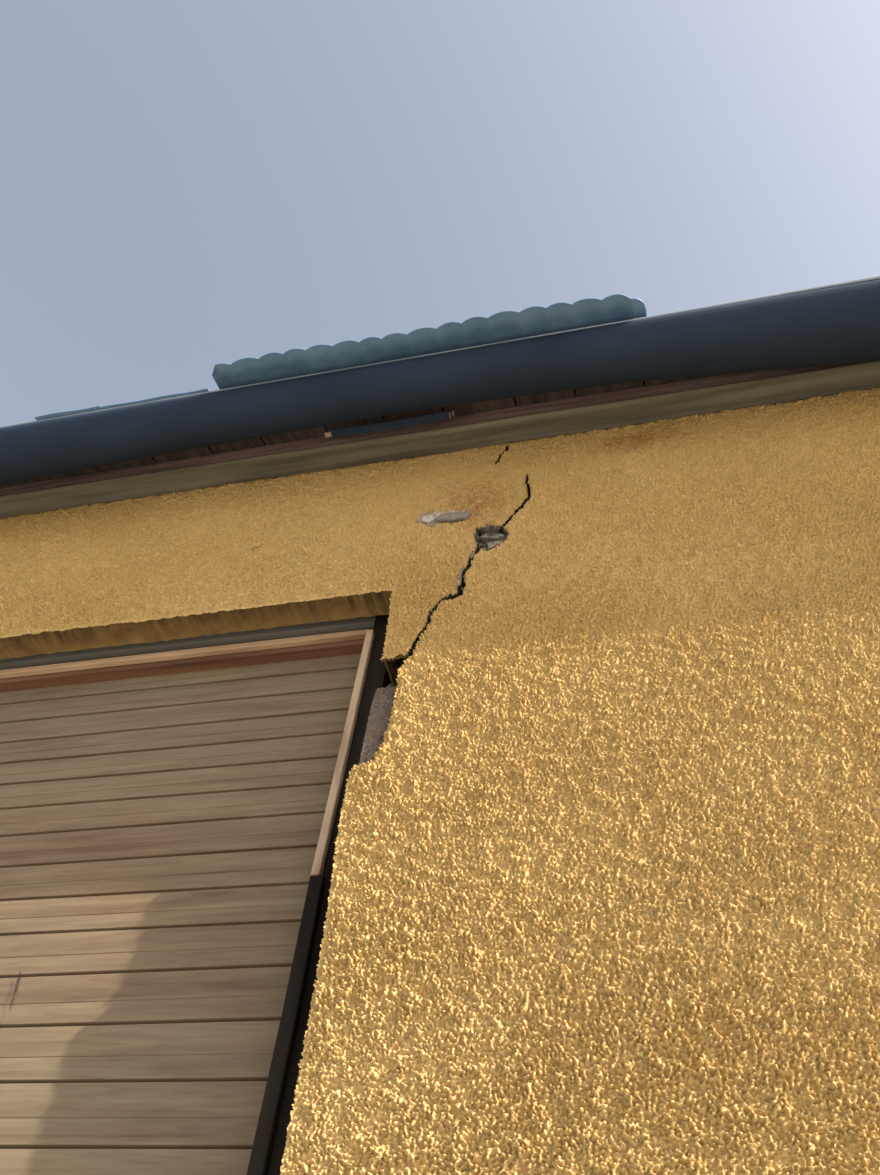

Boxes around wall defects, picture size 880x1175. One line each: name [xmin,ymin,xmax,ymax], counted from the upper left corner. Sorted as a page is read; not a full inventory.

crack [408,474,530,656]